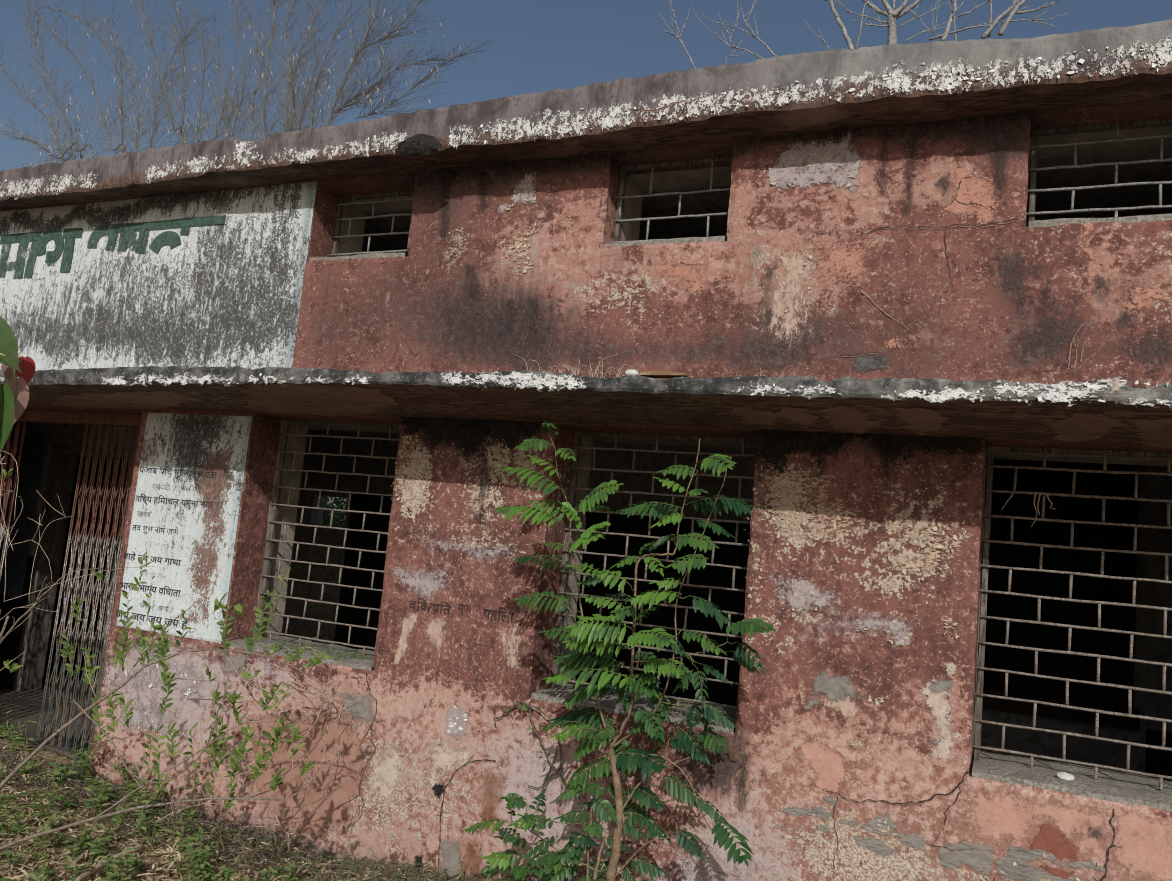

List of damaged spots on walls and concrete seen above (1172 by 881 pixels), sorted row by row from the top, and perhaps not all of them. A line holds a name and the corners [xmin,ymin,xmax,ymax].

peeling [141,32,1172,184]
spalling [766,132,865,194]
peeling [763,234,879,344]
crack [795,175,1018,313]
peeling [944,161,1004,226]
peeling [390,432,425,500]
peeling [745,459,872,609]
peeling [881,503,975,584]
flaking render [920,663,958,762]
crack [804,771,980,879]
peeling [775,738,1172,881]
crack [1093,809,1122,881]